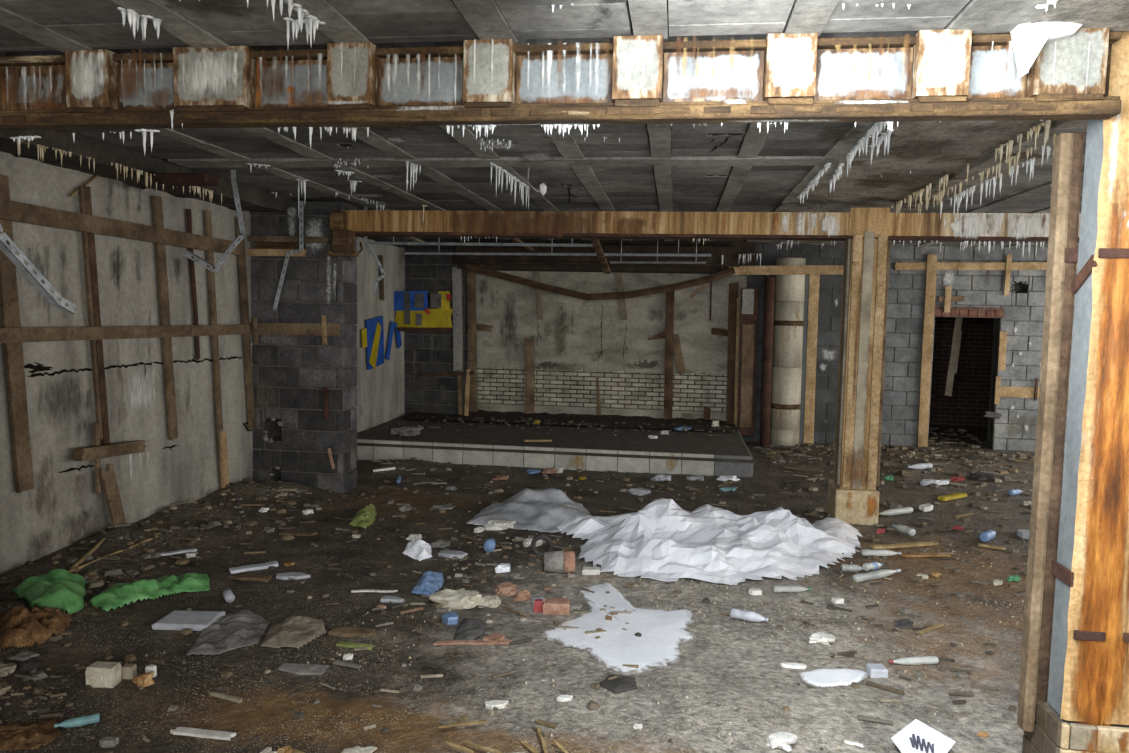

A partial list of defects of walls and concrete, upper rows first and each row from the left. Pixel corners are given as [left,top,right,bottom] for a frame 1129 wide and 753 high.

corrosion [256,50,322,106]
corrosion [689,87,749,98]
corrosion [538,96,651,117]
crack [24,354,243,377]
crack [59,465,94,473]
corrosion [1072,191,1129,753]